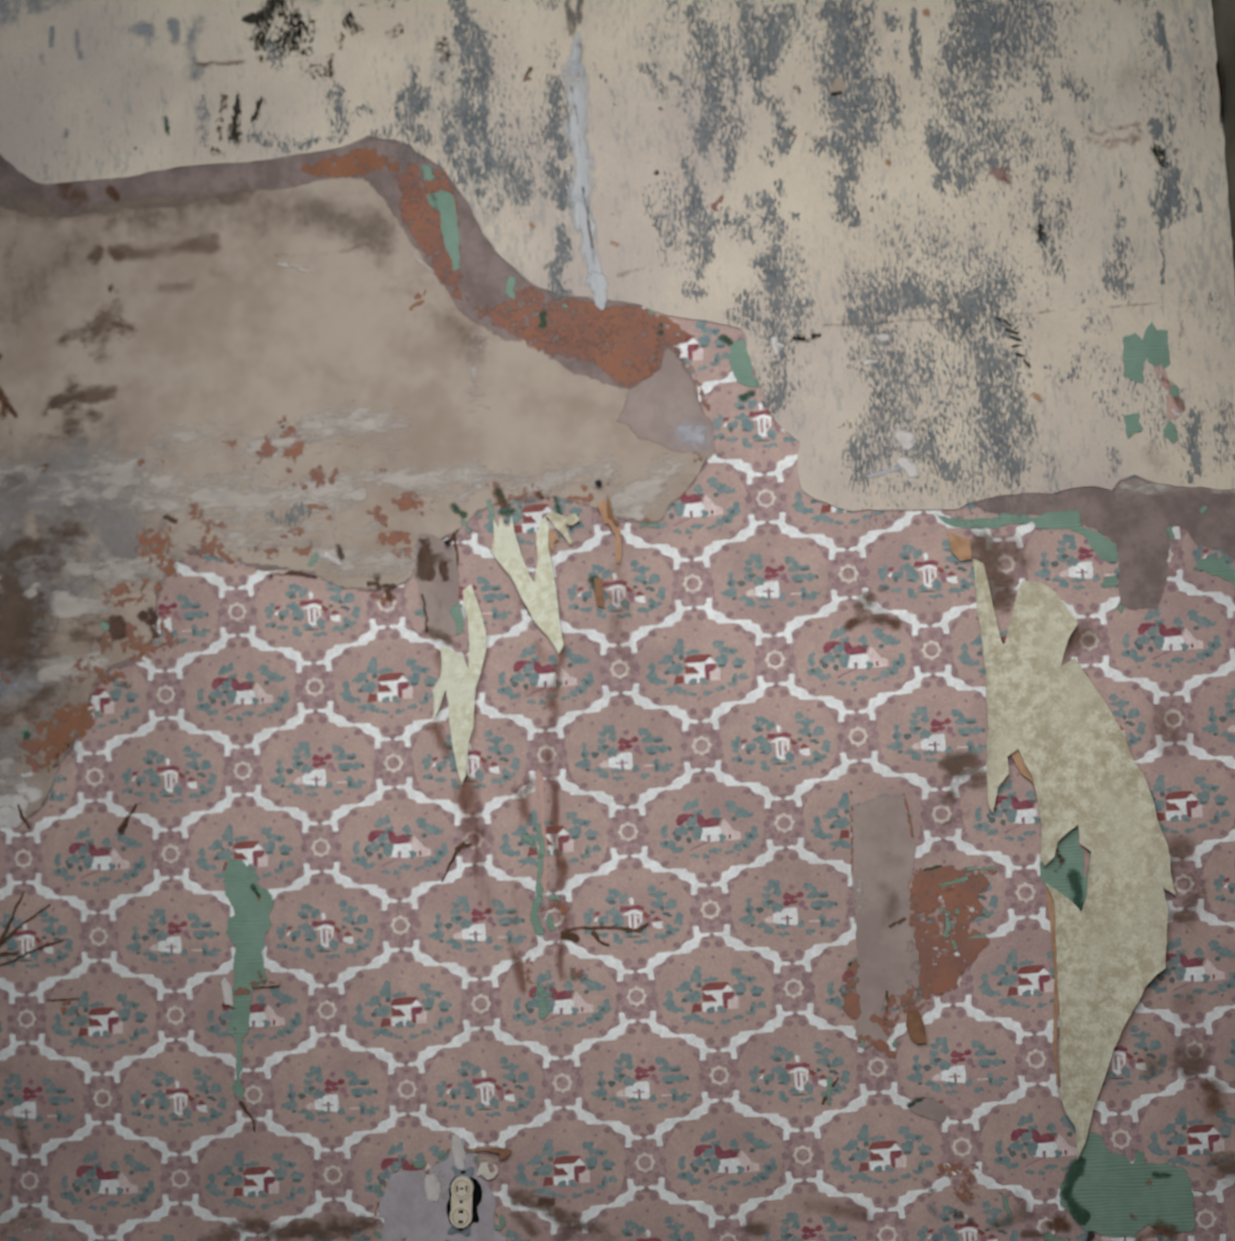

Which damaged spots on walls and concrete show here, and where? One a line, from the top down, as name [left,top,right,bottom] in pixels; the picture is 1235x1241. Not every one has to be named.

flaking render [0,136,704,413]
damp [198,0,574,328]
crack [562,0,607,310]
damp [637,0,1235,526]
damp [0,419,157,773]
damp [68,579,179,689]
damp [163,416,593,578]
damp [972,528,1013,608]
peeling [221,858,273,1099]
peeling [882,865,997,1028]
peeling [1040,825,1091,906]
peeling [1060,1132,1195,1237]